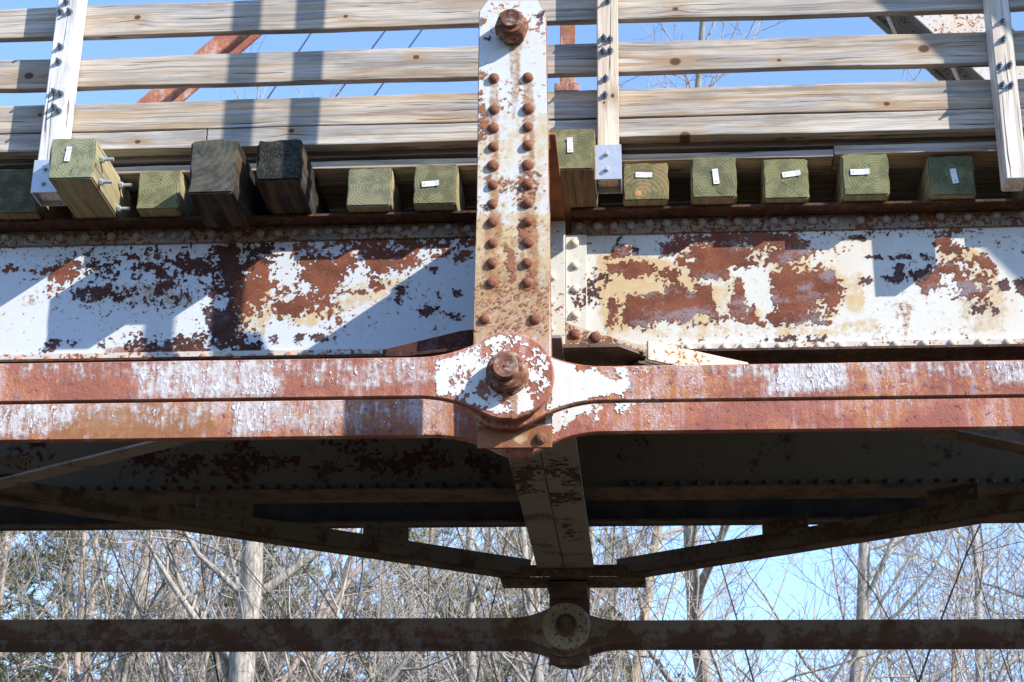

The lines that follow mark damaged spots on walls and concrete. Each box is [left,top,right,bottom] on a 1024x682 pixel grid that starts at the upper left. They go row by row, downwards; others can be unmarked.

rust [0,46,550,354]
peeling [787,227,984,241]
peeling [394,284,408,305]
peeling [416,288,466,321]
rust [570,231,880,337]
peeling [859,253,932,285]
rust [897,228,1005,334]
peeling [969,277,1024,316]
peeling [294,332,329,345]
peeling [566,325,644,352]
peeling [754,333,828,343]
peeling [123,335,648,437]